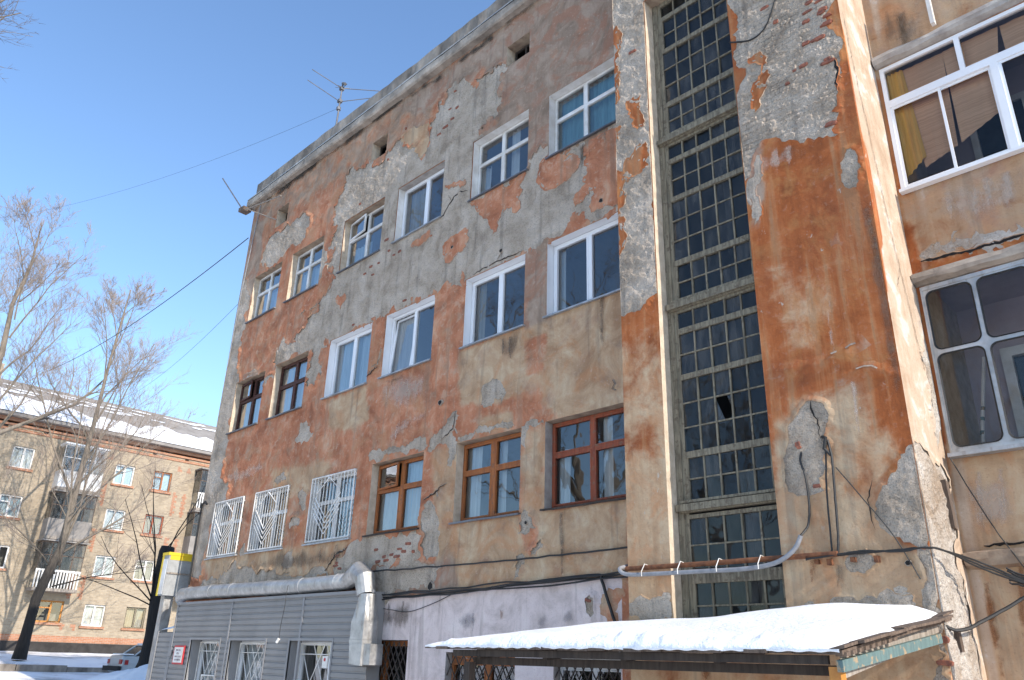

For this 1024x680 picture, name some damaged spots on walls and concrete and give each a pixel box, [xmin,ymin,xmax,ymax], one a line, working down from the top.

spalling [191,0,657,606]
spalling [727,0,866,226]
spalling [779,396,835,502]
peeling [796,273,983,680]
crack [833,19,1024,369]